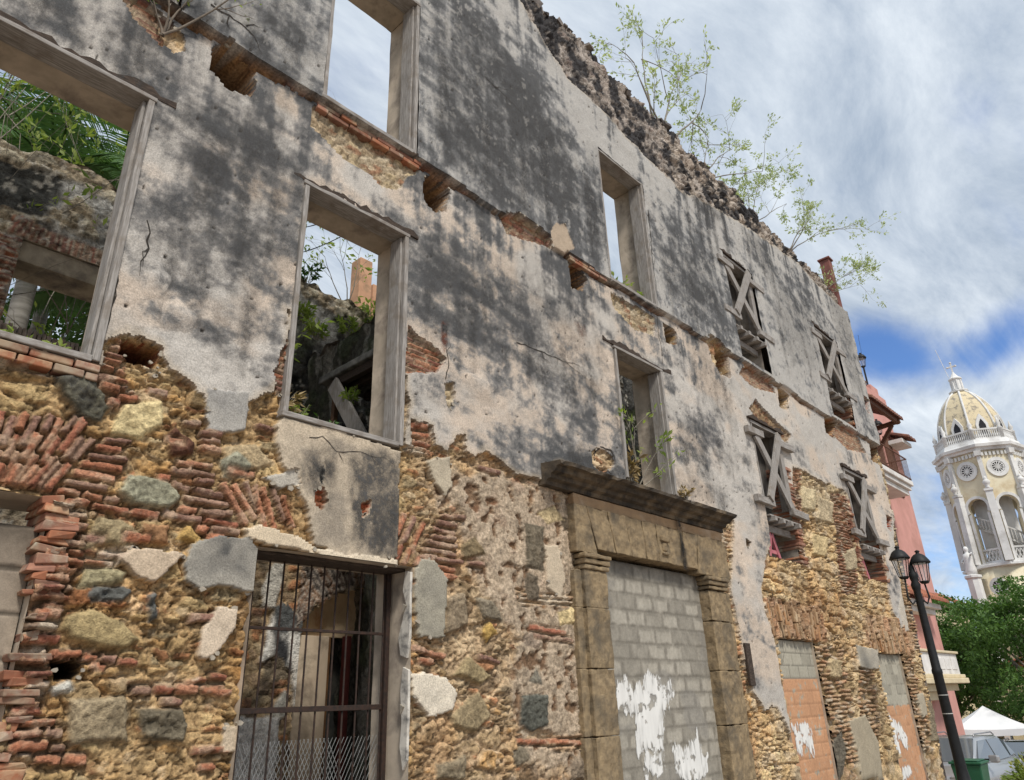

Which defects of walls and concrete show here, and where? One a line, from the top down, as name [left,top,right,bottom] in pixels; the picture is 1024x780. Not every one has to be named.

spalling [209,35,258,98]
spalling [310,104,450,214]
crack [106,220,151,332]
spalling [499,211,588,292]
peeling [202,387,249,436]
crack [309,436,394,465]
spalling [405,325,456,410]
crack [516,342,592,384]
spalling [704,333,792,443]
peeling [114,417,457,770]
spalling [46,655,85,683]
peeling [616,670,708,780]